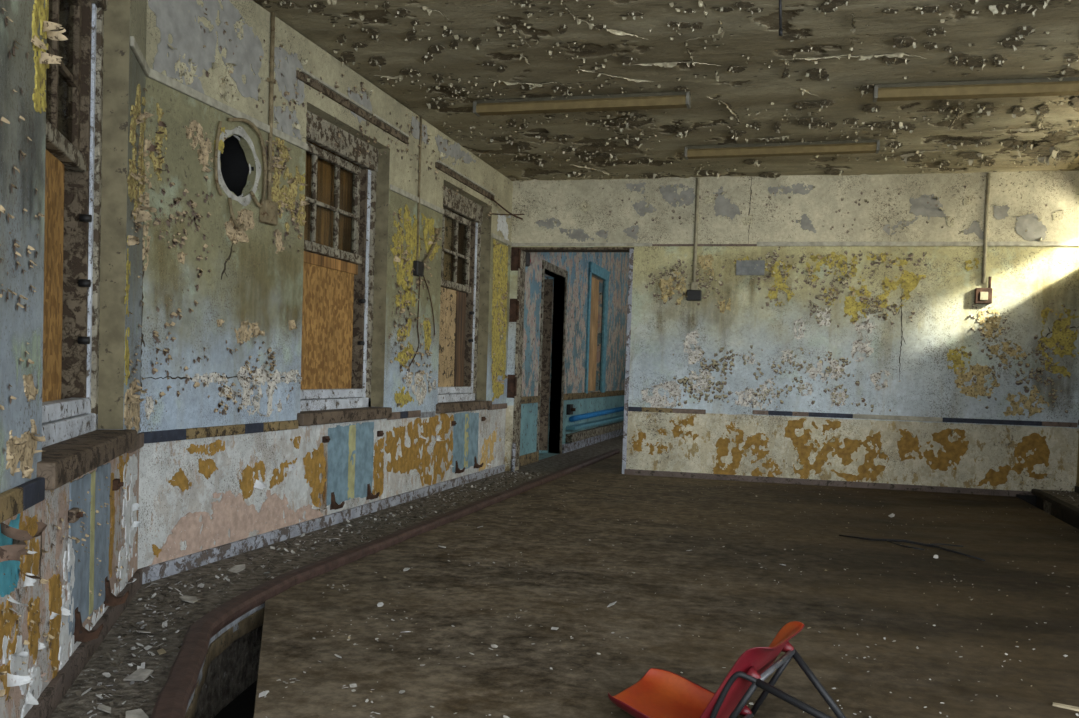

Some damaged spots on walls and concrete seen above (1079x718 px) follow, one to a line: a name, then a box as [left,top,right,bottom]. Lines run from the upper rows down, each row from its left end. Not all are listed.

peeling [9,0,68,114]
peeling [124,0,324,433]
peeling [258,0,1079,417]
peeling [0,204,548,718]
peeling [713,418,969,482]
peeling [975,433,1050,486]